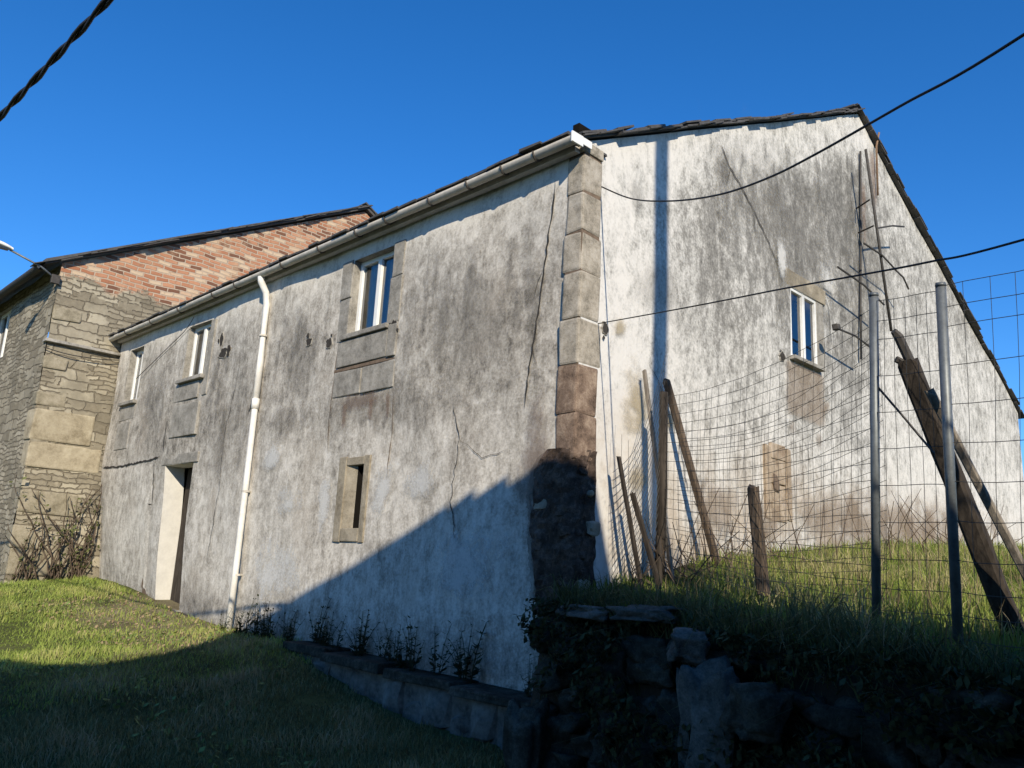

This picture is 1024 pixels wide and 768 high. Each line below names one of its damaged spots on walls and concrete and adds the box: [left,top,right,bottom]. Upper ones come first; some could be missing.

crack [524,189,555,408]
crack [450,408,502,538]
flaking render [577,459,596,497]
flaking render [586,521,601,537]